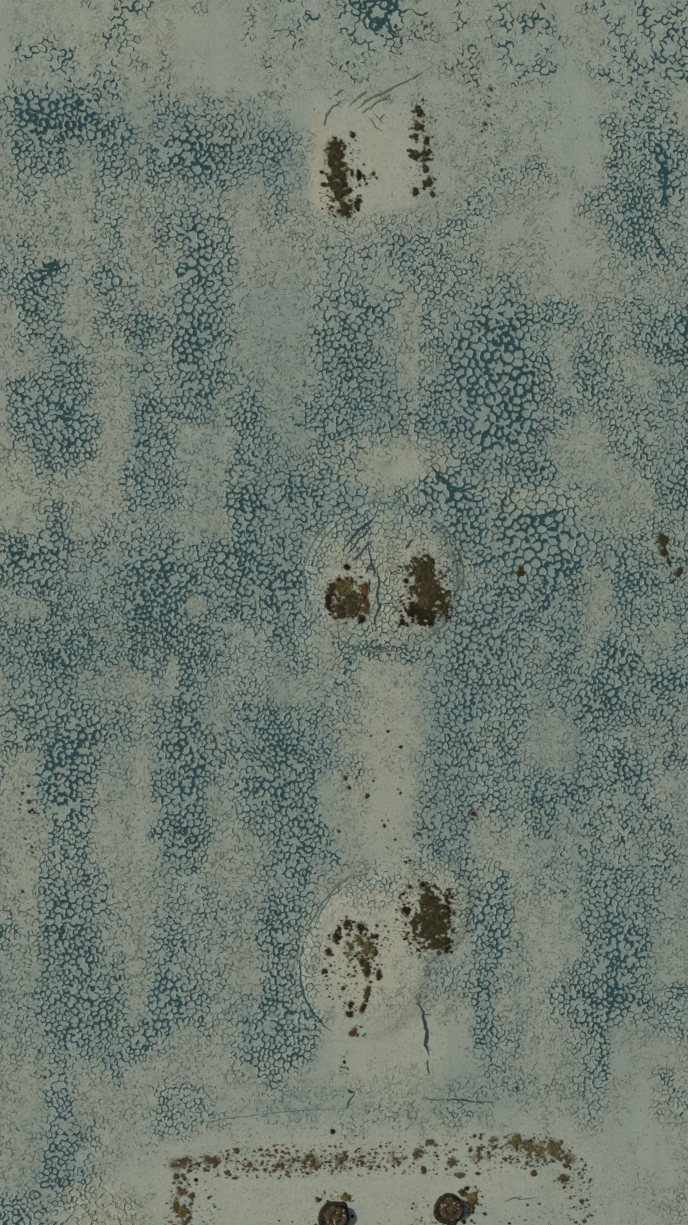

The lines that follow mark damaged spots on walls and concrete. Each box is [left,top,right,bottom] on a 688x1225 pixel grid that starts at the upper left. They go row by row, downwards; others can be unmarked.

crack [242,4,267,47]
crack [260,51,295,88]
crack [271,0,446,107]
crack [446,0,470,32]
crack [576,0,606,32]
corrosion [319,131,378,218]
corrosion [407,98,436,197]
corrosion [325,564,370,625]
corrosion [390,548,453,632]
corrosion [321,849,456,1037]
corrosion [164,1129,596,1225]
crack [467,1167,544,1222]